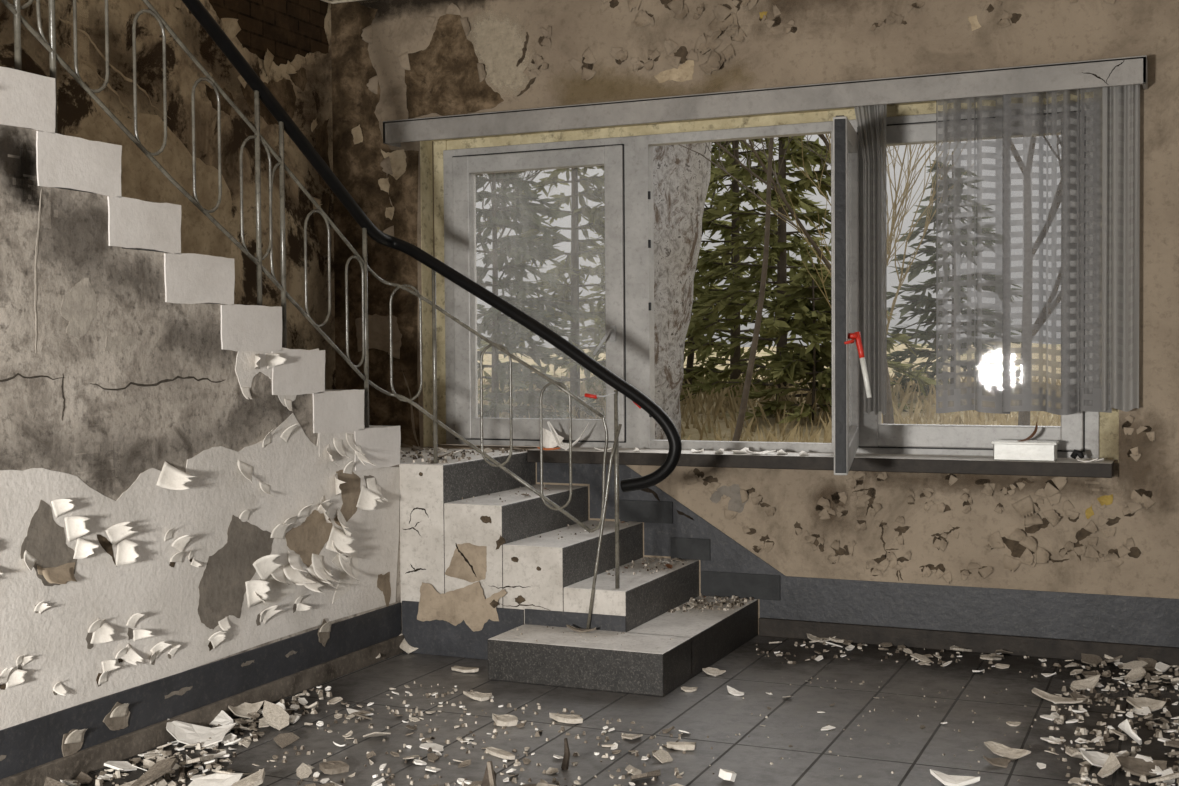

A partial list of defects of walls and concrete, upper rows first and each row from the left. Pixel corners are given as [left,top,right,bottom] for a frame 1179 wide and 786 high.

peeling [397,3,504,119]
peeling [977,0,1022,28]
leakage [0,128,38,205]
crack [94,376,224,391]
peeling [0,0,419,731]
peeling [794,471,911,576]
peeling [905,474,1156,584]
peeling [417,535,526,632]
peeling [61,728,87,757]
peeling [419,743,444,752]